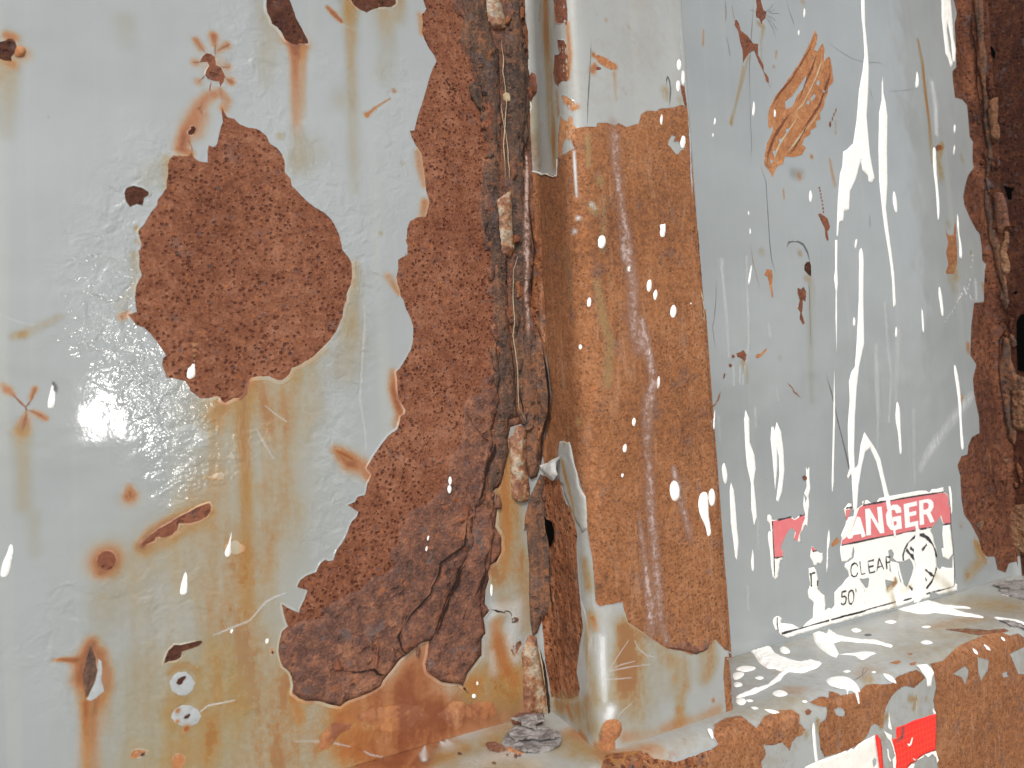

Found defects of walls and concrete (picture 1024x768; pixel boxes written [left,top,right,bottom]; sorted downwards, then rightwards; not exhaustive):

rust [193,32,230,64]
peeling [521,101,557,204]
rust [276,0,529,768]
peeling [391,0,542,685]
rust [530,0,1024,768]
rust [91,547,122,578]
rust [135,501,215,555]
crack [397,443,512,654]
rust [54,637,113,768]
rust [165,694,190,732]
rust [161,640,203,683]